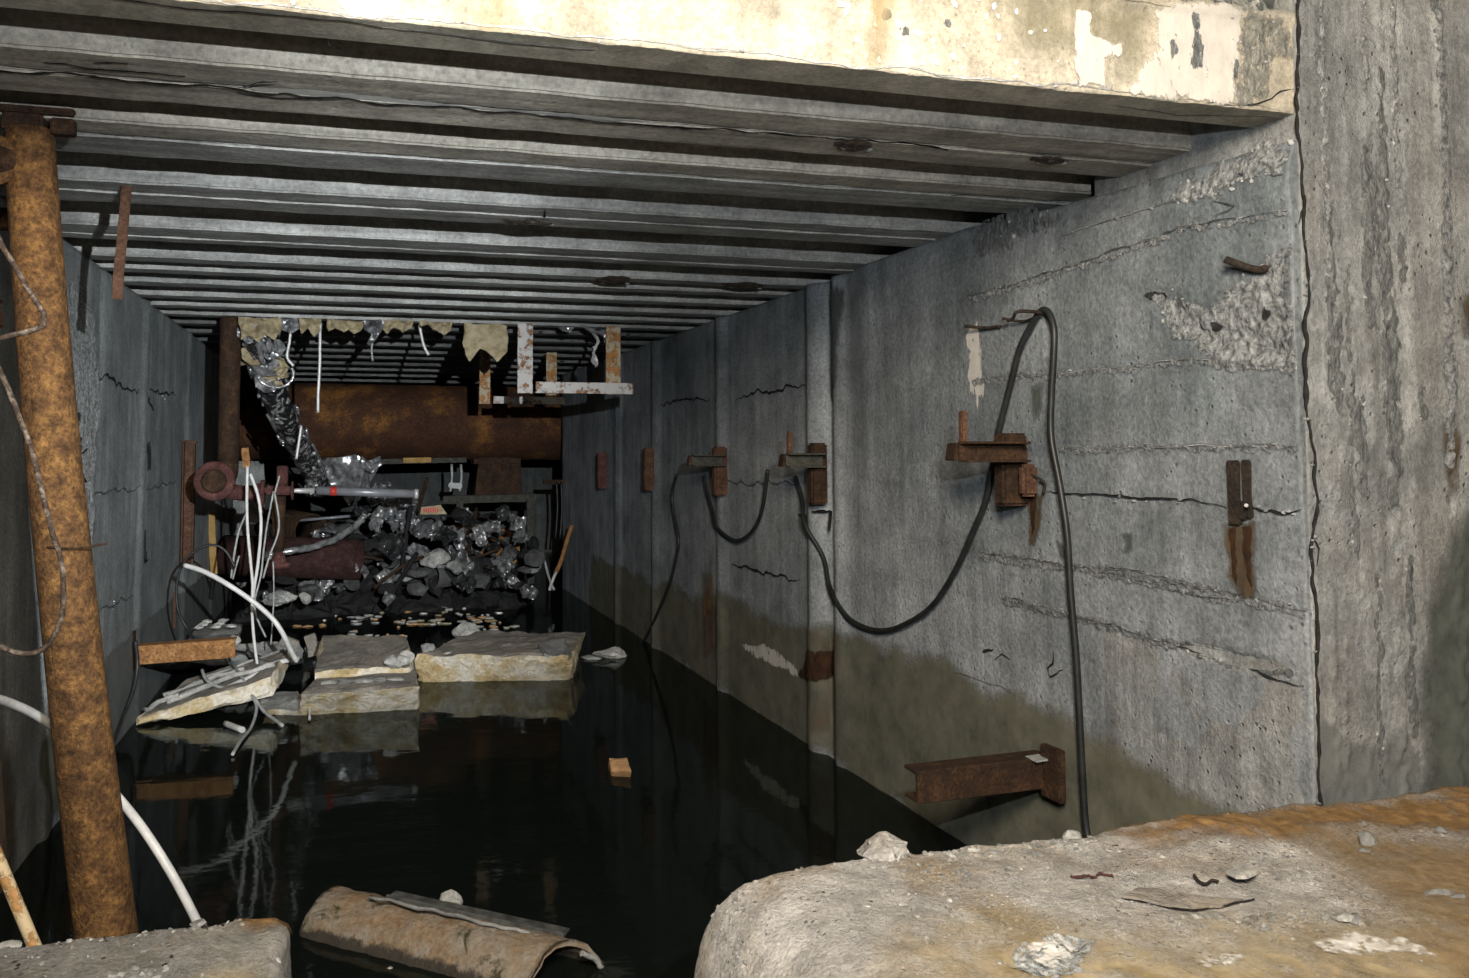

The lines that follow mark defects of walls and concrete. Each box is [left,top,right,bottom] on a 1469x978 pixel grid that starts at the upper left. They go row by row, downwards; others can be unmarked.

peeling [199,0,1293,111]
spalling [1145,243,1297,376]
crack [957,0,1324,807]
corrosion [1225,523,1255,599]
damp [0,757,15,866]